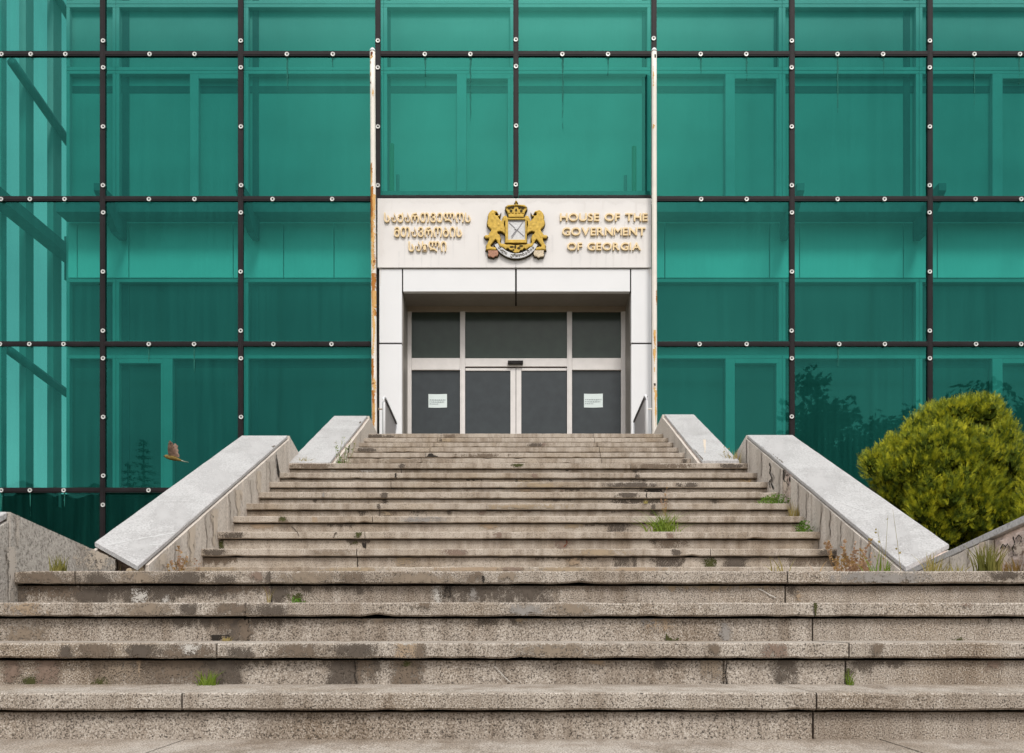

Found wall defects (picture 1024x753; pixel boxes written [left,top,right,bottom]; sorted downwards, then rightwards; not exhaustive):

crack [768,463,811,530]